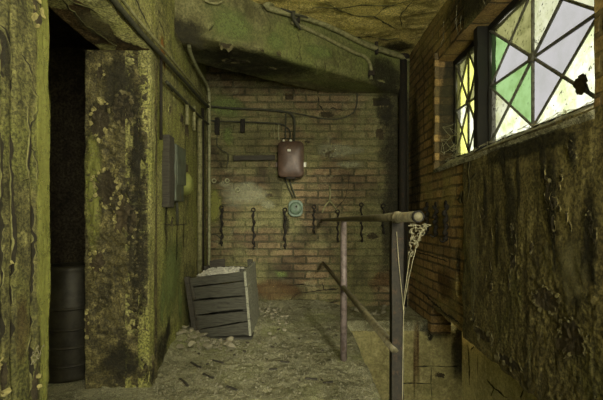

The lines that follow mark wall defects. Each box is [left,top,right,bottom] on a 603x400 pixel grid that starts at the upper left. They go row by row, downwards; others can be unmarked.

damp [0,35,12,79]
damp [42,0,50,102]
crack [312,1,413,40]
damp [105,55,149,323]
damp [372,58,400,213]
damp [491,130,575,269]
damp [581,190,597,283]
damp [41,238,49,400]